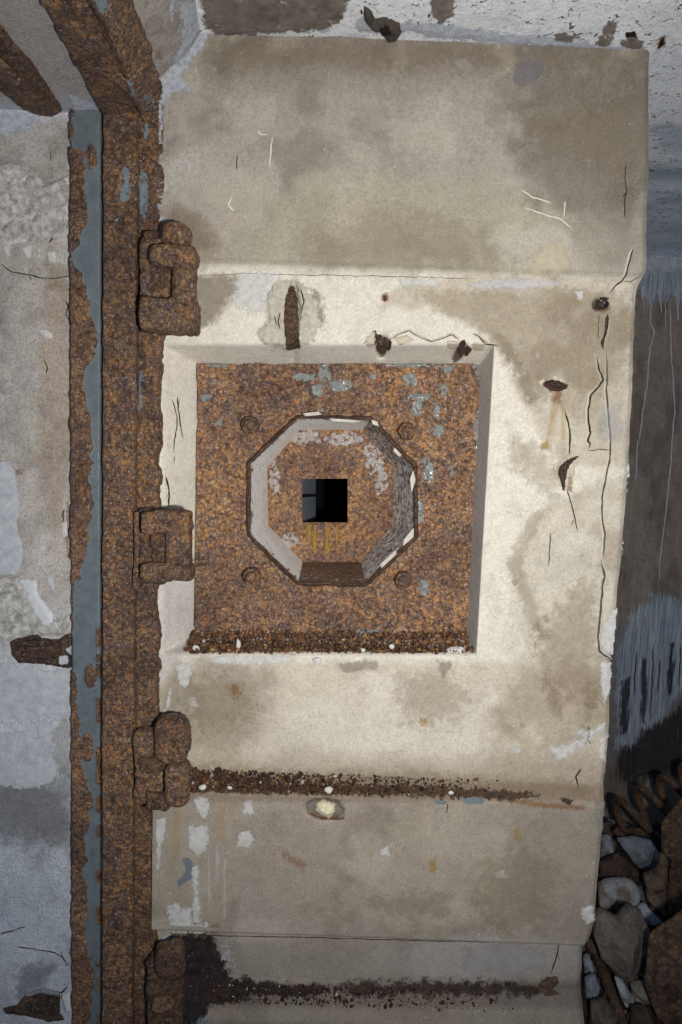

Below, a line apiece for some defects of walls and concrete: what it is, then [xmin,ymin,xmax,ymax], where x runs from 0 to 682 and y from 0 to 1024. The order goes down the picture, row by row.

spalling [364,6,401,43]
damp [157,0,210,222]
spalling [256,279,323,353]
crack [366,329,498,346]
crack [548,248,640,660]
damp [612,255,682,786]
spalling [306,786,345,820]